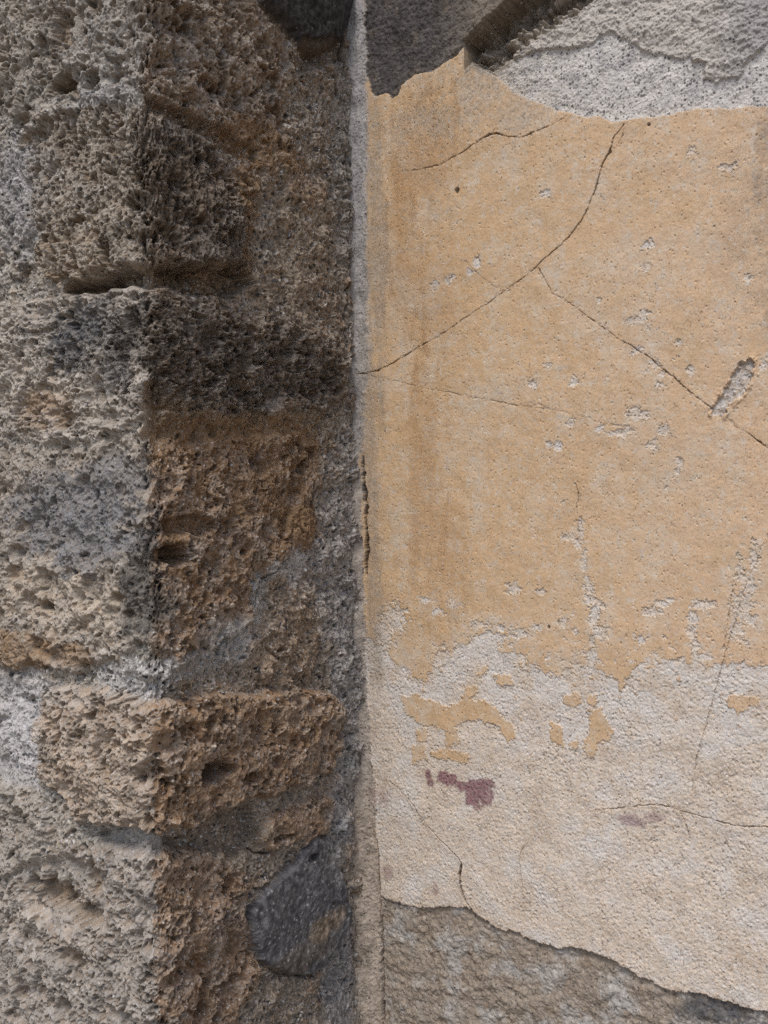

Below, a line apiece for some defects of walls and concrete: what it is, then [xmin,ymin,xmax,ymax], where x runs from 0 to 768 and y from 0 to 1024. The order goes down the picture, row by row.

spalling [467,0,768,123]
crack [356,116,768,448]
crack [362,454,370,573]
flaking render [364,516,768,1024]
crack [589,536,768,840]